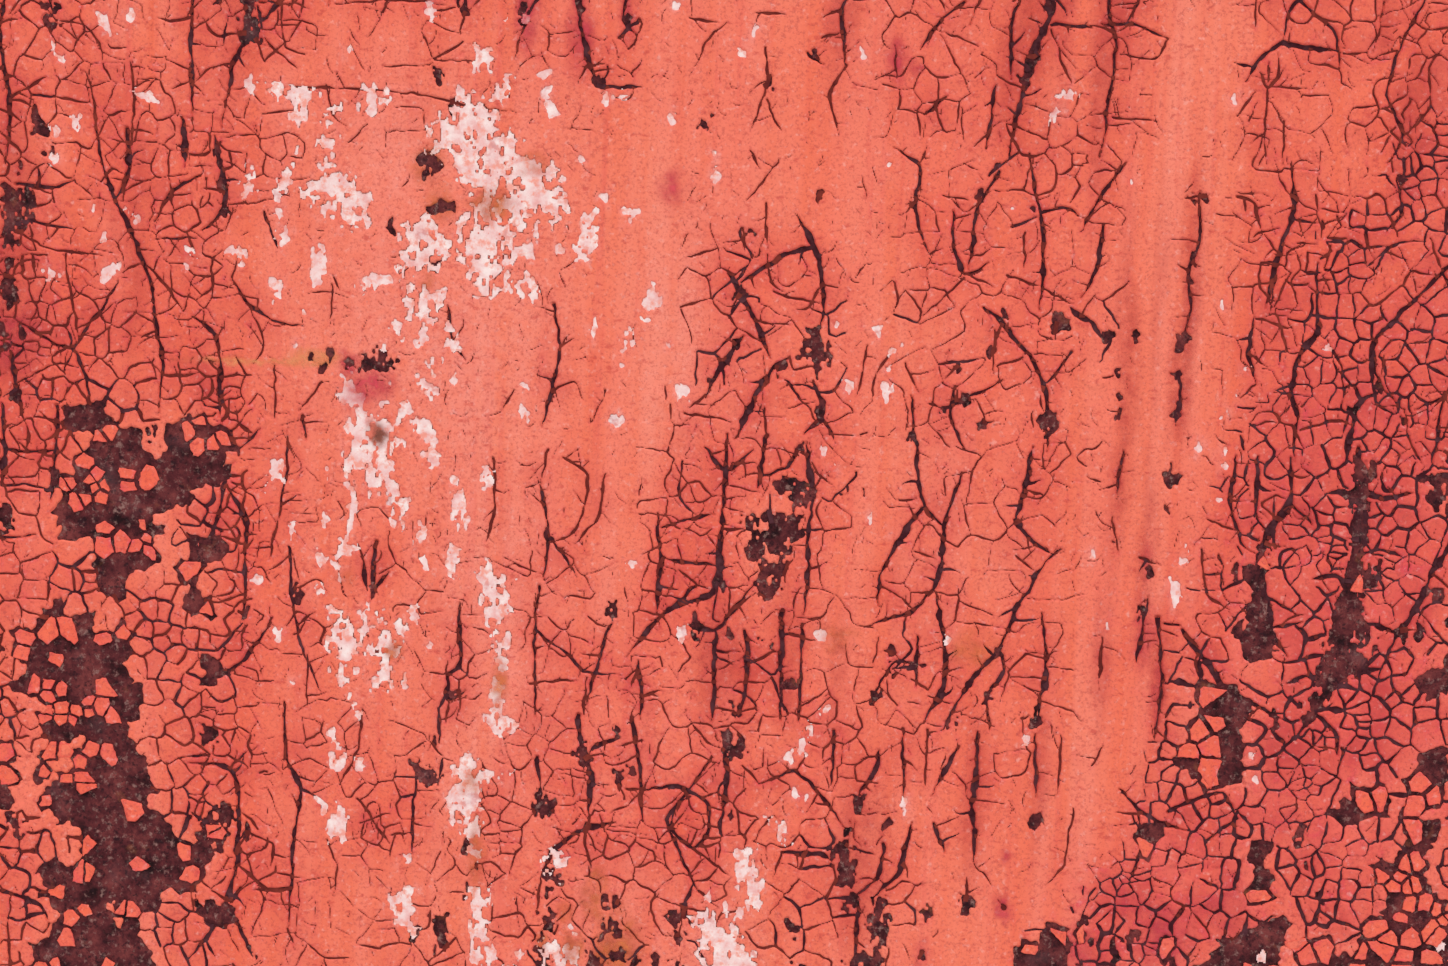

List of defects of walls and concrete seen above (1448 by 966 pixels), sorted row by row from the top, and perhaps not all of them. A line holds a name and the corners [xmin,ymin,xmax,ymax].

peeling [238,73,392,247]
peeling [314,42,641,739]
rust [0,396,251,966]
crack [0,0,914,966]
rust [741,476,818,601]
rust [1297,455,1448,728]
peeling [464,883,580,966]
peeling [687,843,765,966]
crack [904,930,938,961]
crack [1118,782,1273,962]
rust [1013,746,1448,966]
crack [1303,875,1382,952]